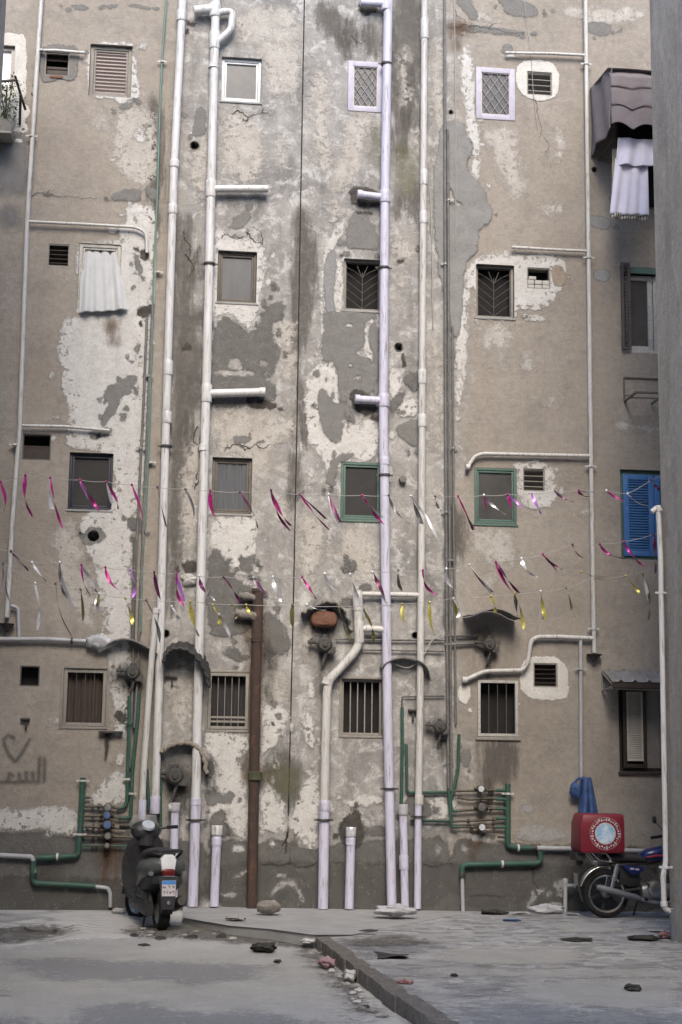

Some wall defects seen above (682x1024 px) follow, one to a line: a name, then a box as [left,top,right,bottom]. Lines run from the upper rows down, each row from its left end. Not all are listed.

flaking render [211,186,419,494]
peeling [454,244,571,421]
peeling [49,187,159,740]
peeling [0,753,126,837]
leakage [264,755,300,805]
peeling [203,681,383,853]